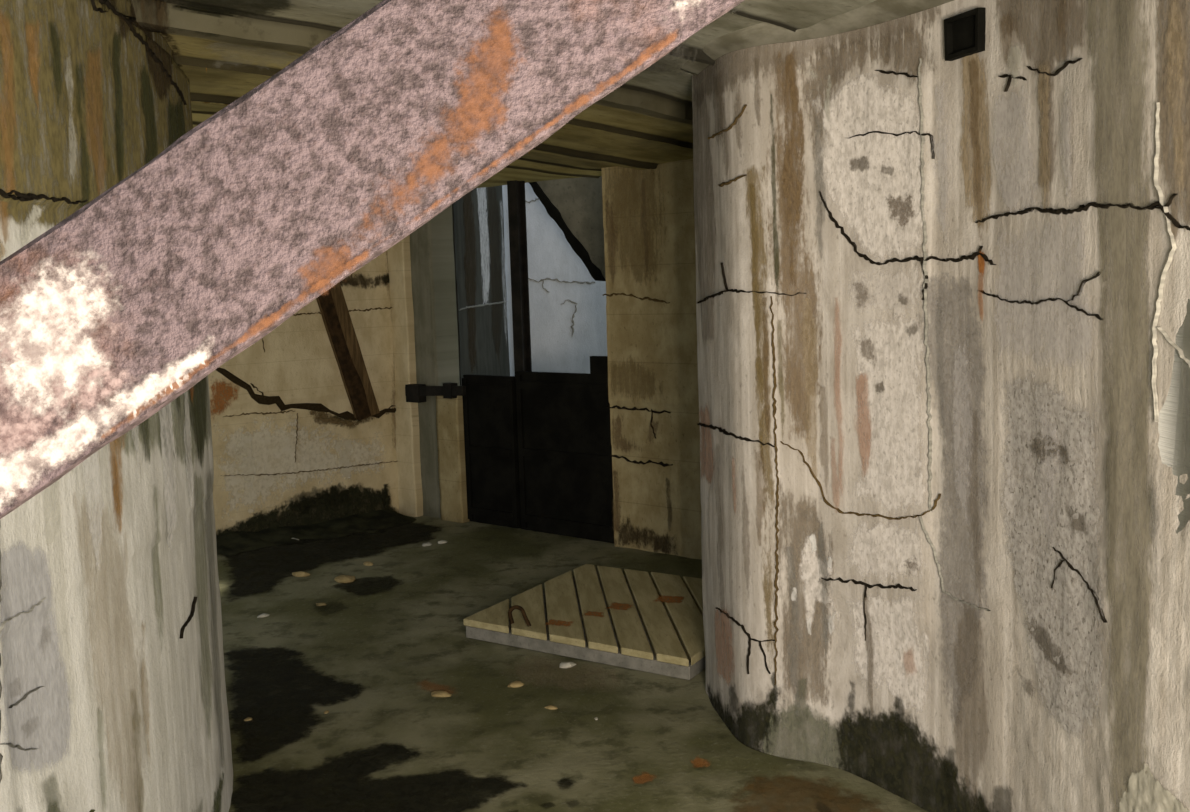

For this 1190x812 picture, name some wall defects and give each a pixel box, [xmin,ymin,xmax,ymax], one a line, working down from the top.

corrosion [138,0,182,66]
corrosion [395,21,514,207]
corrosion [473,33,676,178]
crack [0,189,88,204]
corrosion [236,247,368,344]
corrosion [102,352,224,531]
corrosion [210,381,238,415]
crack [216,367,397,476]
crack [528,58,1190,682]
crack [0,597,47,633]